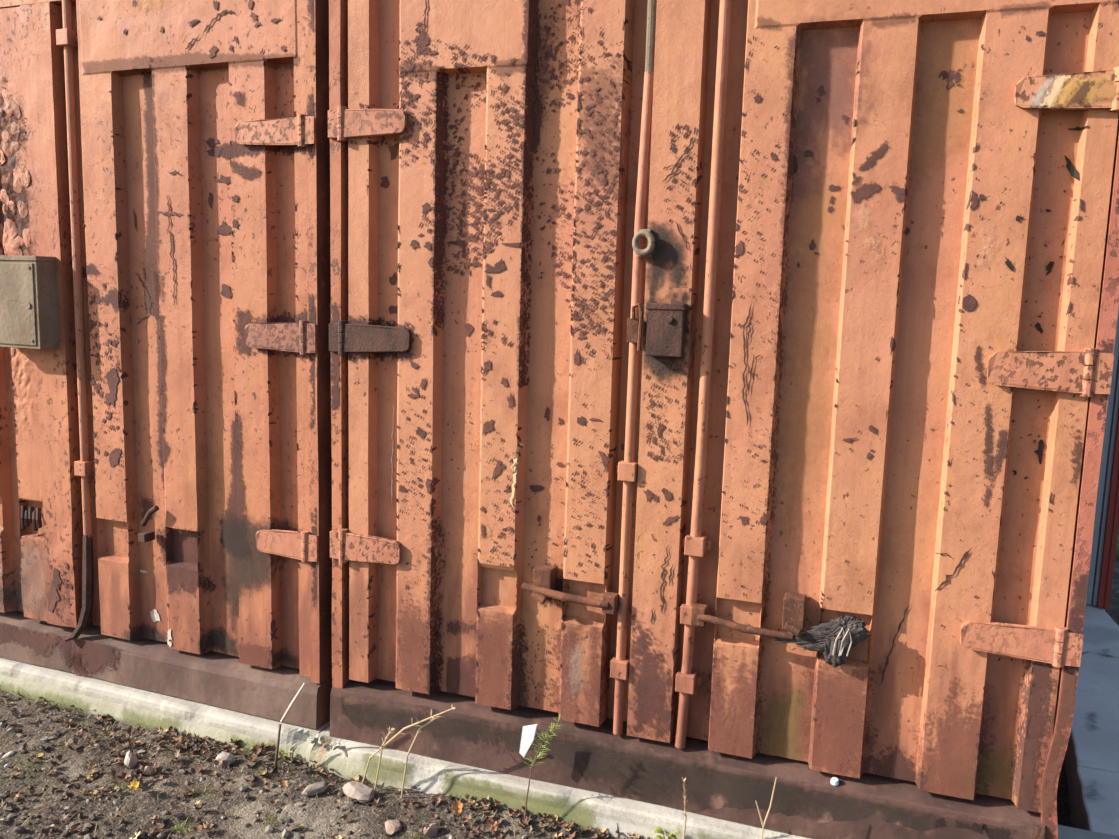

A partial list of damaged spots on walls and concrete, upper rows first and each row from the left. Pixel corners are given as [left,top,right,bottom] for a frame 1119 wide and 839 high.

rust [233,91,246,107]
rust [132,68,216,594]
rust [218,219,239,235]
rust [206,137,314,207]
rust [220,283,316,428]
rust [330,302,414,410]
rust [409,70,467,336]
rust [473,259,506,297]
rust [501,0,543,388]
rust [219,414,247,549]
rust [982,404,1008,507]
rust [627,613,678,743]